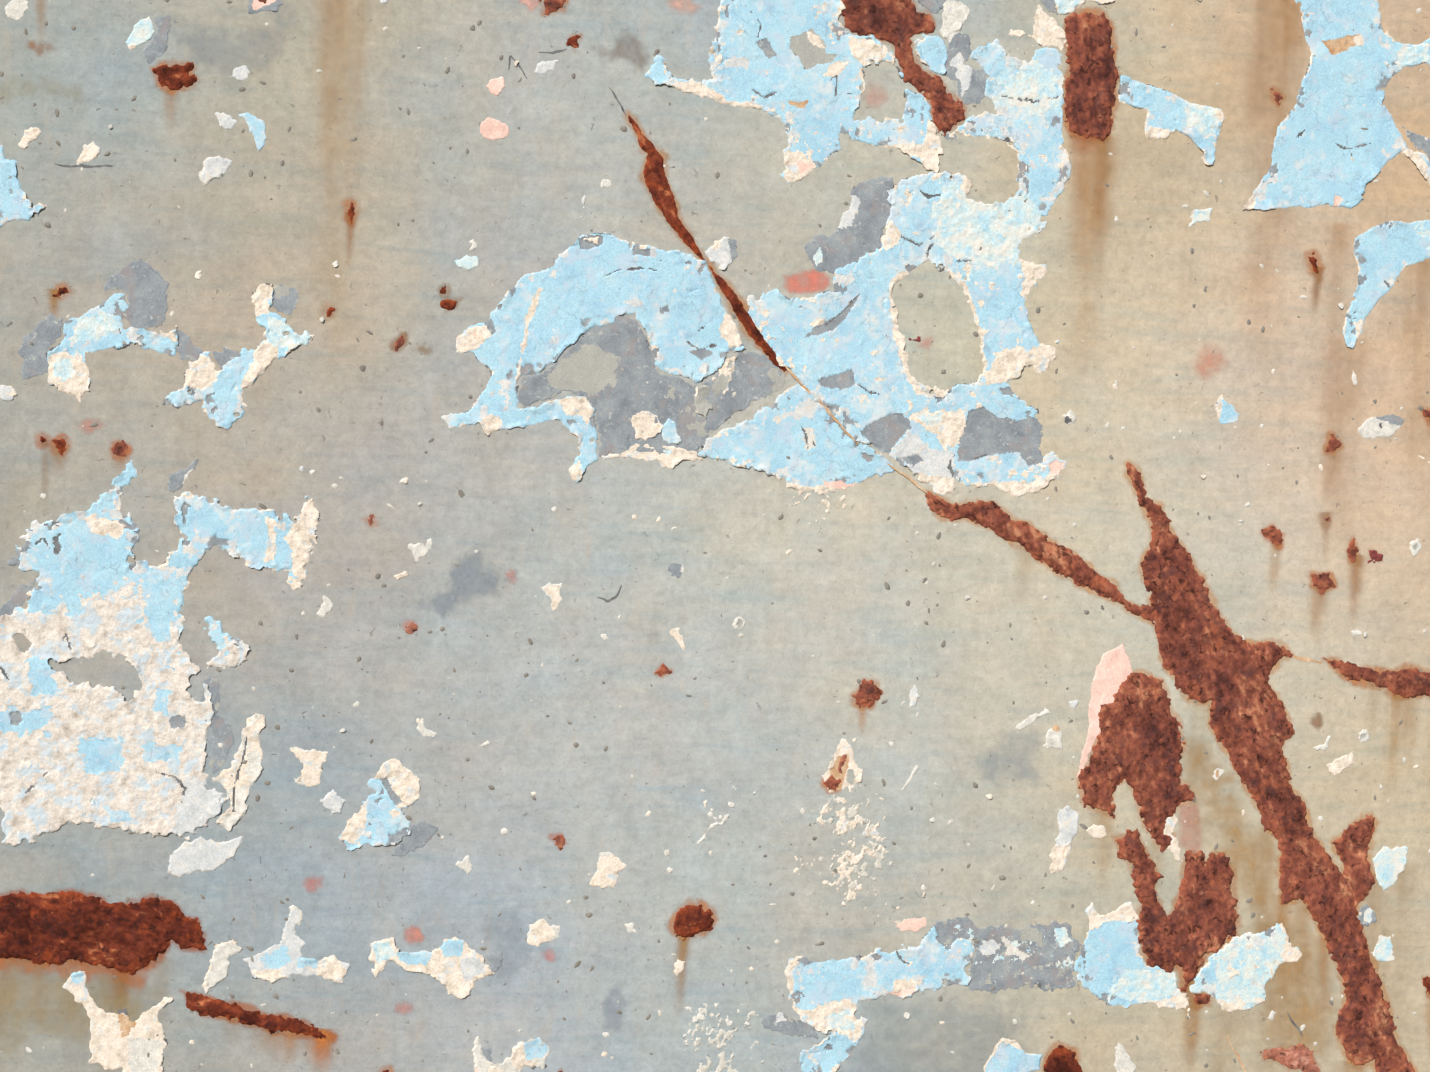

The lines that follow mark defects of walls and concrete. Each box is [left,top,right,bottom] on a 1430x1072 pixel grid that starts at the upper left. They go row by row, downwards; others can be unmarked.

rust [841,0,965,137]
rust [1063,9,1119,151]
peeling [1242,0,1430,210]
crack [610,88,858,444]
peeling [441,0,1115,498]
peeling [46,283,314,430]
crack [597,585,622,603]
peeling [0,460,319,878]
rust [1078,670,1239,1007]
rust [670,901,716,960]
peeling [1074,902,1302,1020]
rust [1043,1045,1083,1072]